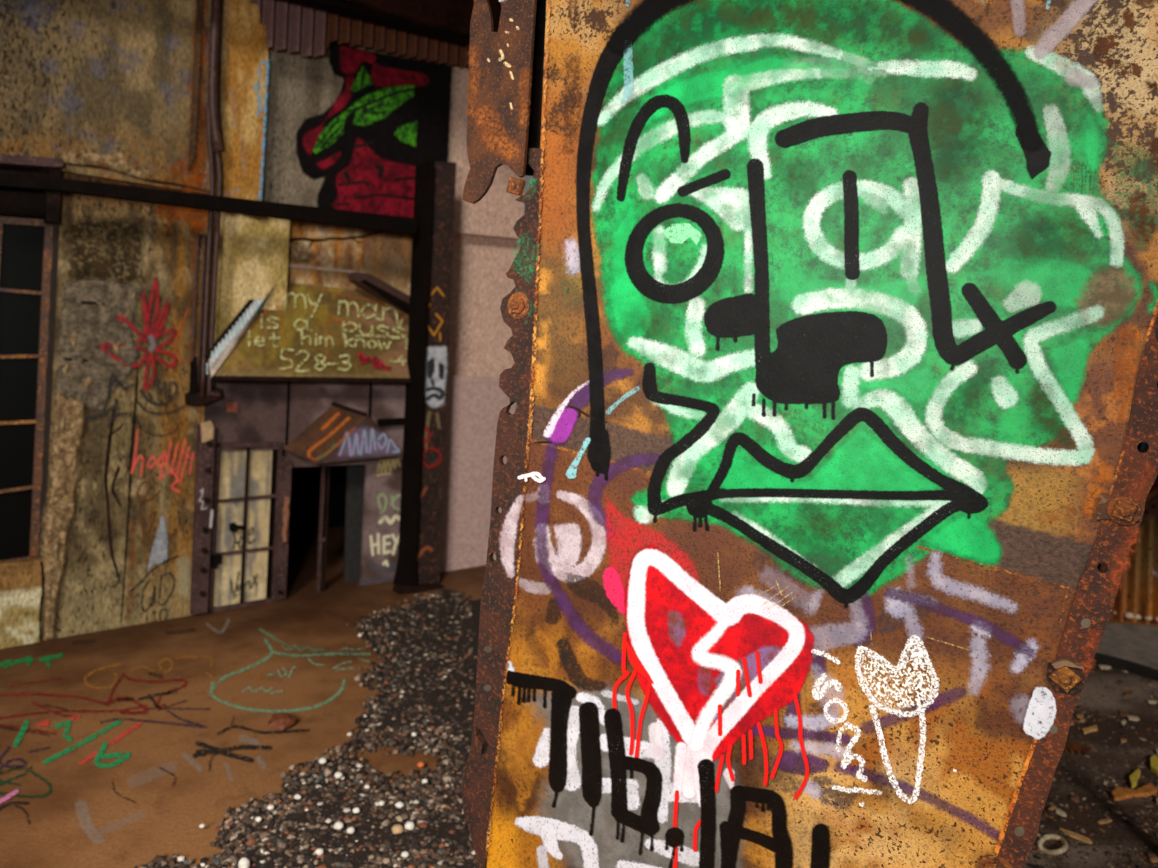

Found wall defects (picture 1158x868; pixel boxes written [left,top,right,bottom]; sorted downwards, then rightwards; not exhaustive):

rust [1123,0,1155,30]
rust [1093,35,1158,92]
rust [468,46,519,159]
rust [1129,138,1158,241]
rust [157,204,208,273]
rust [1114,327,1140,420]
rust [1083,463,1111,516]
rust [1111,528,1139,592]
rust [508,711,544,808]